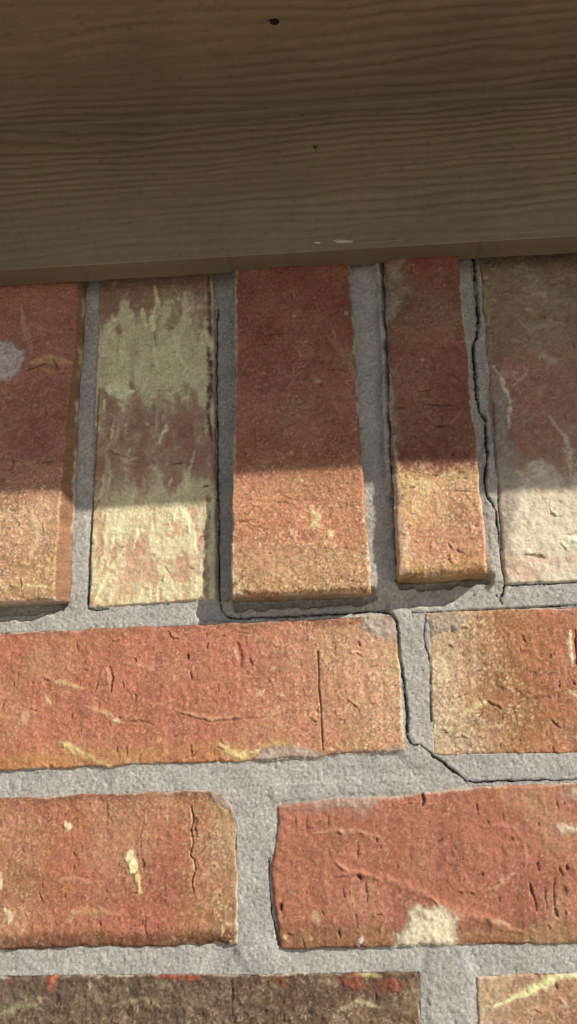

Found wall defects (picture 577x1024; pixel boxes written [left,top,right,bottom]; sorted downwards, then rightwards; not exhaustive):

crack [215,309,442,660]
crack [469,258,577,610]
crack [400,670,577,786]